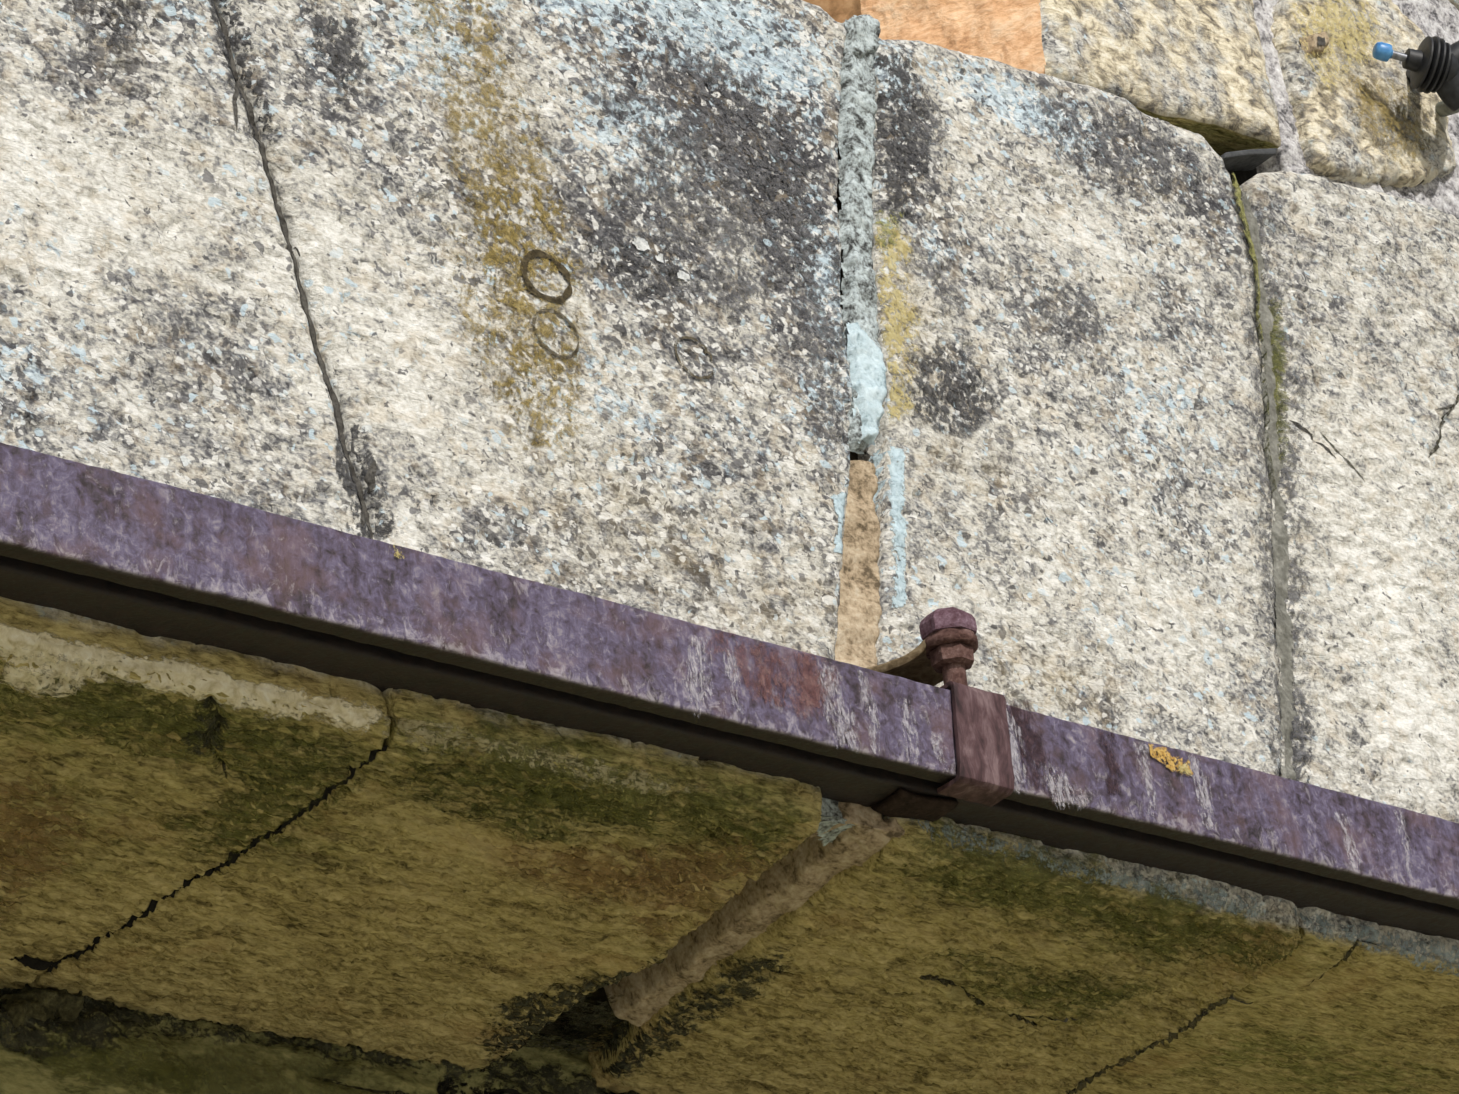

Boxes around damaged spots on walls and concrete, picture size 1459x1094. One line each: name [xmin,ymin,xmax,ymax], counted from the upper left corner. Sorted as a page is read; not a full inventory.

crack [1429,395,1459,457]
crack [182,696,229,779]
crack [9,745,389,972]
crack [1306,940,1377,986]
damp [0,949,793,1094]
crack [1066,994,1253,1094]